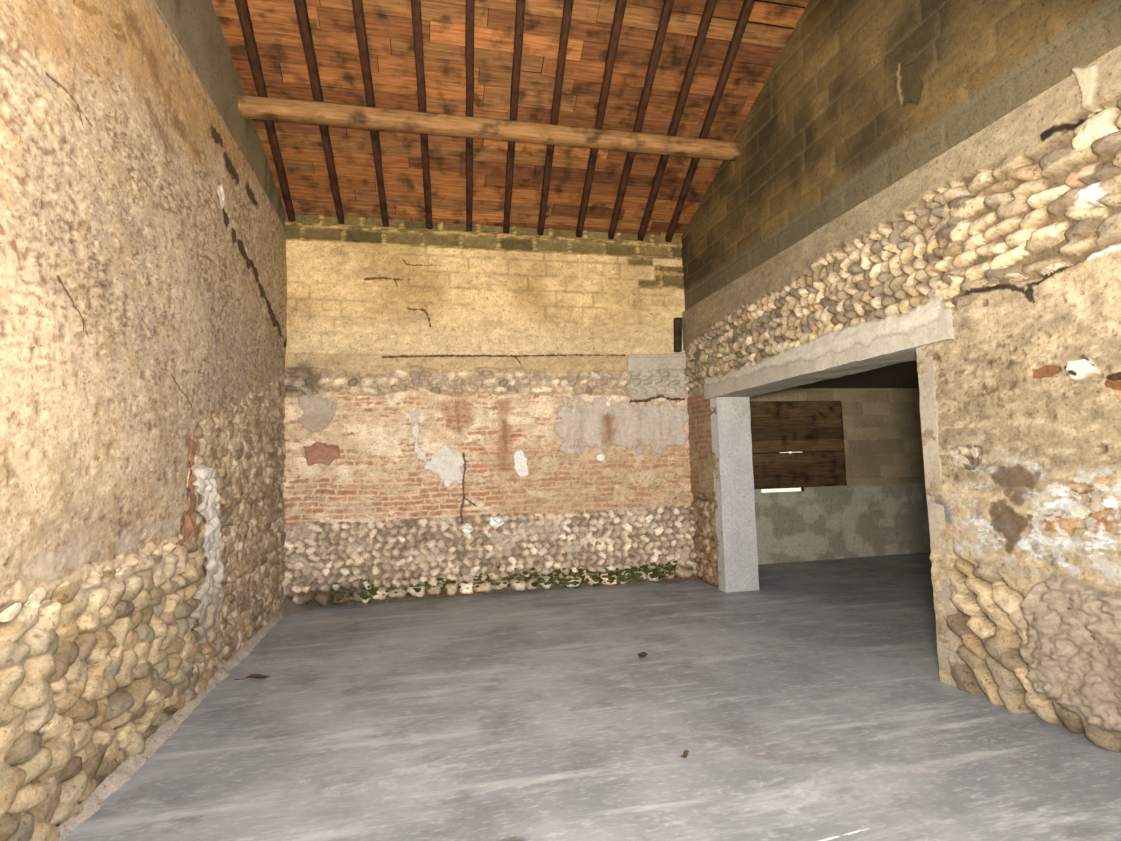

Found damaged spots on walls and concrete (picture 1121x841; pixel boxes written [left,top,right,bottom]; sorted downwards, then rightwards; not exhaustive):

crack [216,184,287,347]
spalling [1033,365,1061,378]
spalling [1104,372,1121,401]
peeling [298,393,340,465]
peeling [553,396,689,455]
peeling [0,437,197,622]
water stain [936,459,1121,583]